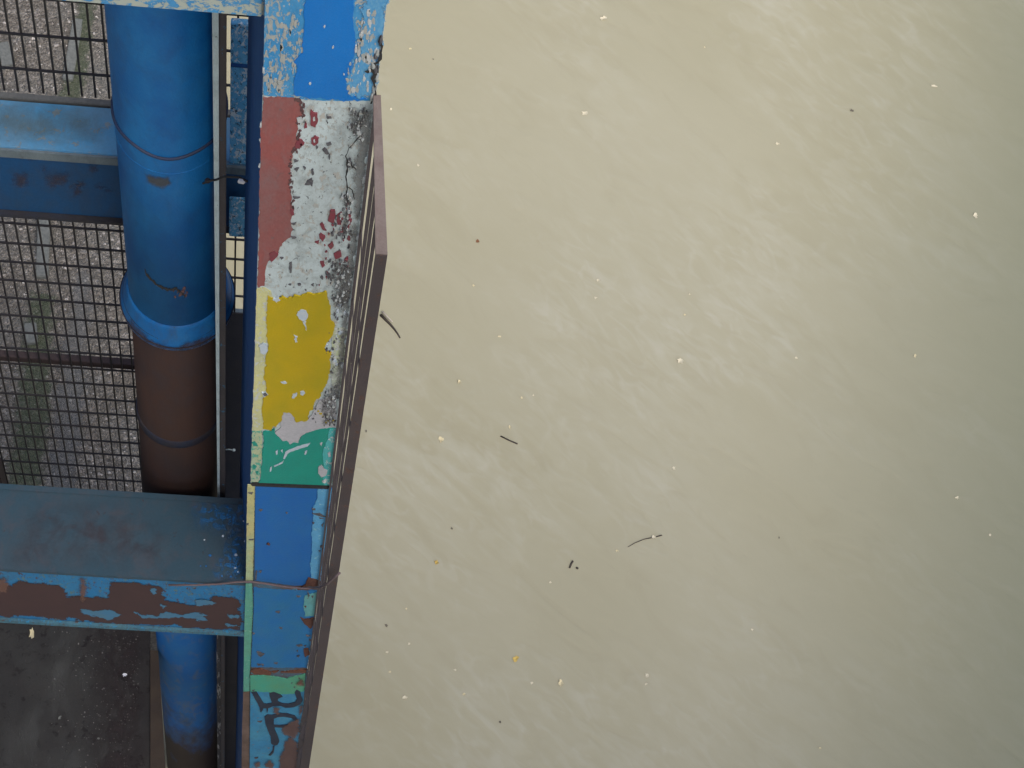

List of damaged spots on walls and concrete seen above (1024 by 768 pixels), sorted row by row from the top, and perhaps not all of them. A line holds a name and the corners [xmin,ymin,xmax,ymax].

peeling [343,0,389,101]
peeling [263,4,332,239]
corrosion [148,176,170,187]
crack [345,135,361,202]
peeling [269,204,362,374]
peeling [253,391,337,483]
corrosion [0,578,243,630]